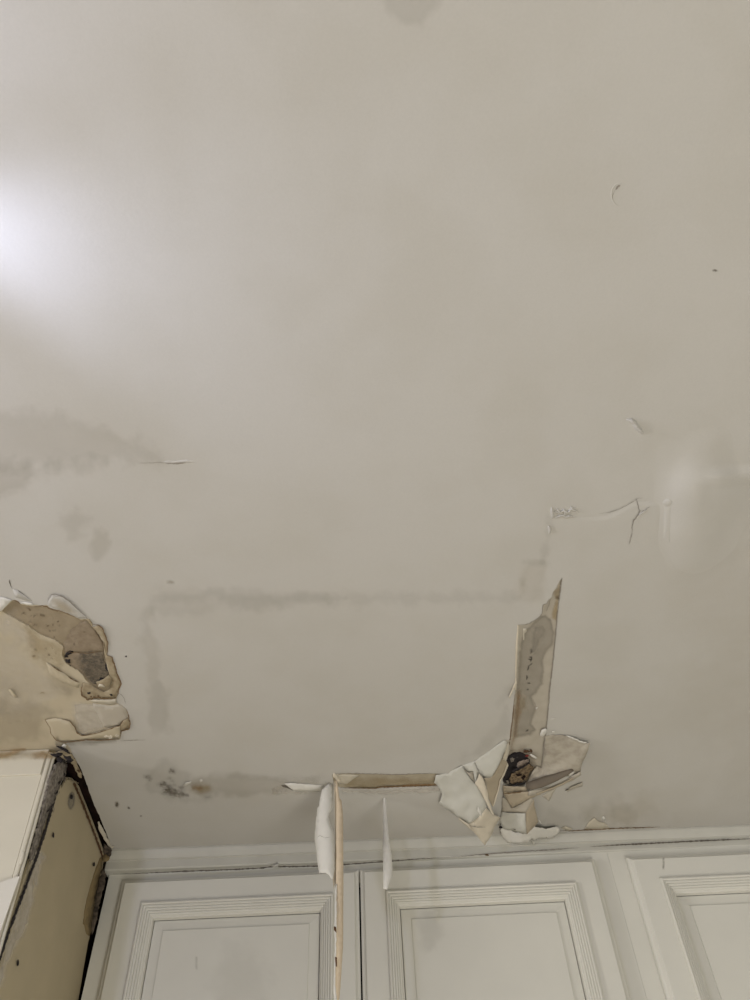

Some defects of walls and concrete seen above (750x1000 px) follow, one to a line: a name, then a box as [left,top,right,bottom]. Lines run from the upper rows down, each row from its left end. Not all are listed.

flaking render [0,594,133,778]